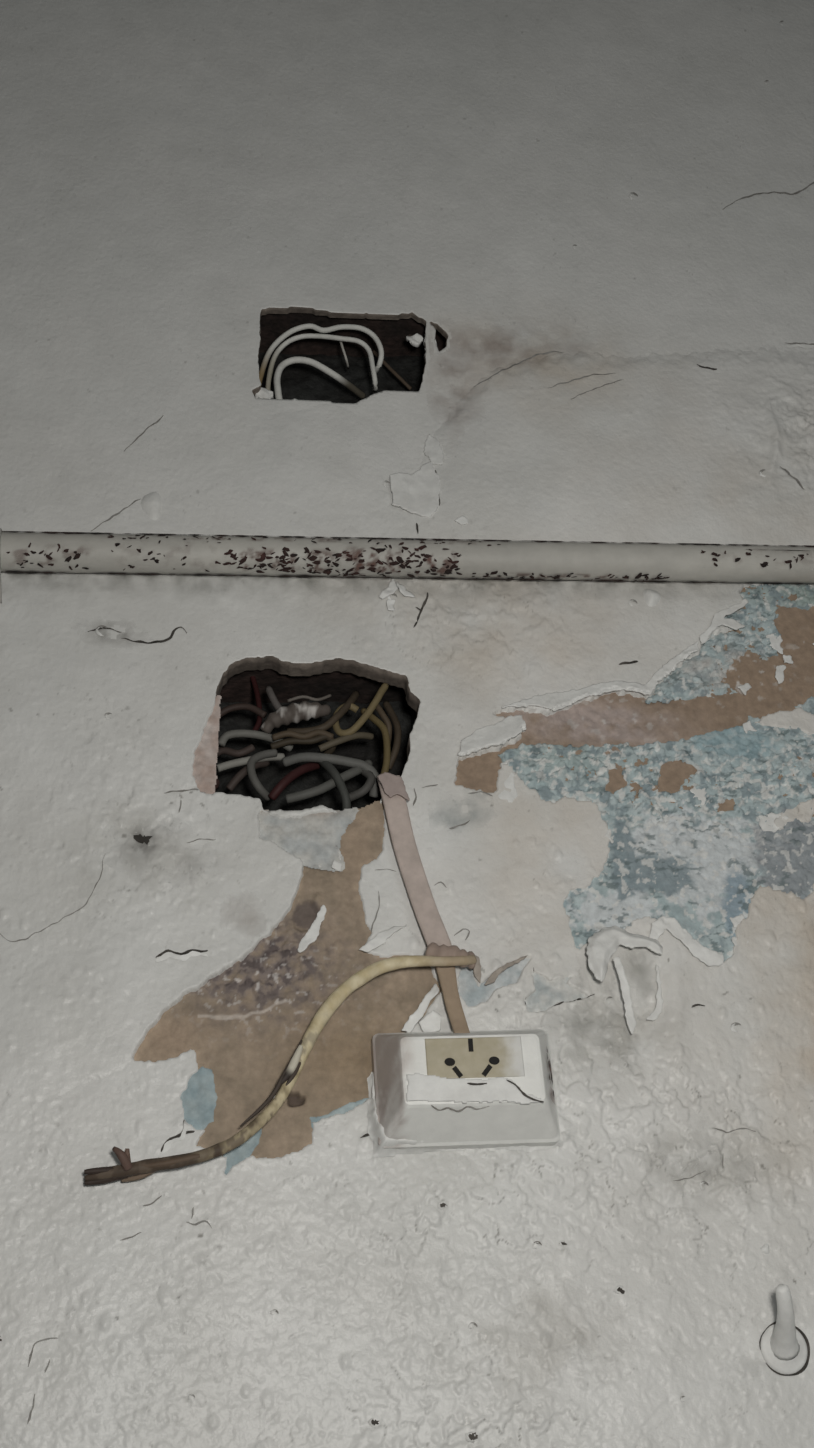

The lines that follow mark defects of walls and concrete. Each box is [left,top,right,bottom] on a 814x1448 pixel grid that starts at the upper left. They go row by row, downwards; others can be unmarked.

crack [724,182,814,209]
rust [6,542,89,570]
rust [108,534,669,582]
peeling [379,579,415,611]
crack [88,627,187,644]
spalling [192,695,221,794]
peeling [455,583,814,1034]
crack [1,855,105,942]
peeling [134,801,530,1175]